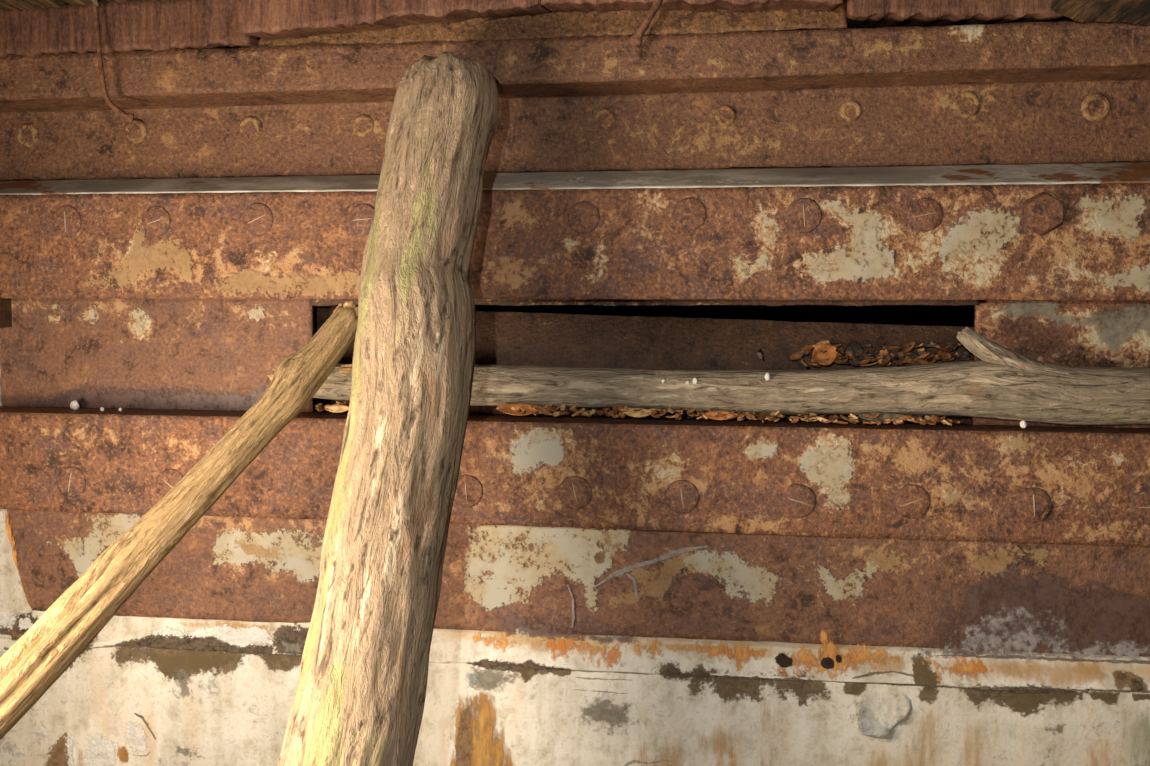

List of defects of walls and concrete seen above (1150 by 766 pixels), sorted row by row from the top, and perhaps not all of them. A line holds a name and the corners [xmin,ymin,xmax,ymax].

corrosion [252,0,847,47]
corrosion [5,514,22,587]
water stain [111,623,302,696]
corrosion [472,632,514,652]
corrosion [532,636,622,668]
corrosion [634,639,766,671]
water stain [655,662,831,706]
corrosion [777,630,902,679]
water stain [843,683,867,696]
water stain [912,654,940,704]
water stain [959,684,1150,717]
corrosion [450,693,512,766]